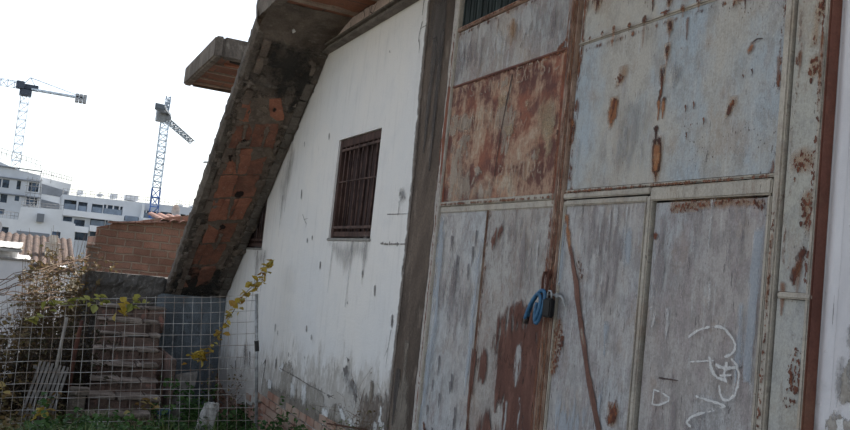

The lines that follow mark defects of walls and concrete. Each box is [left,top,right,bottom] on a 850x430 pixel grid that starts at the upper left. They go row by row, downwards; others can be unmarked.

rust [795,0,825,122]
spalling [184,91,287,292]
rust [414,0,786,430]
peeling [275,353,388,430]
peeling [825,411,850,430]
peeling [836,360,850,404]